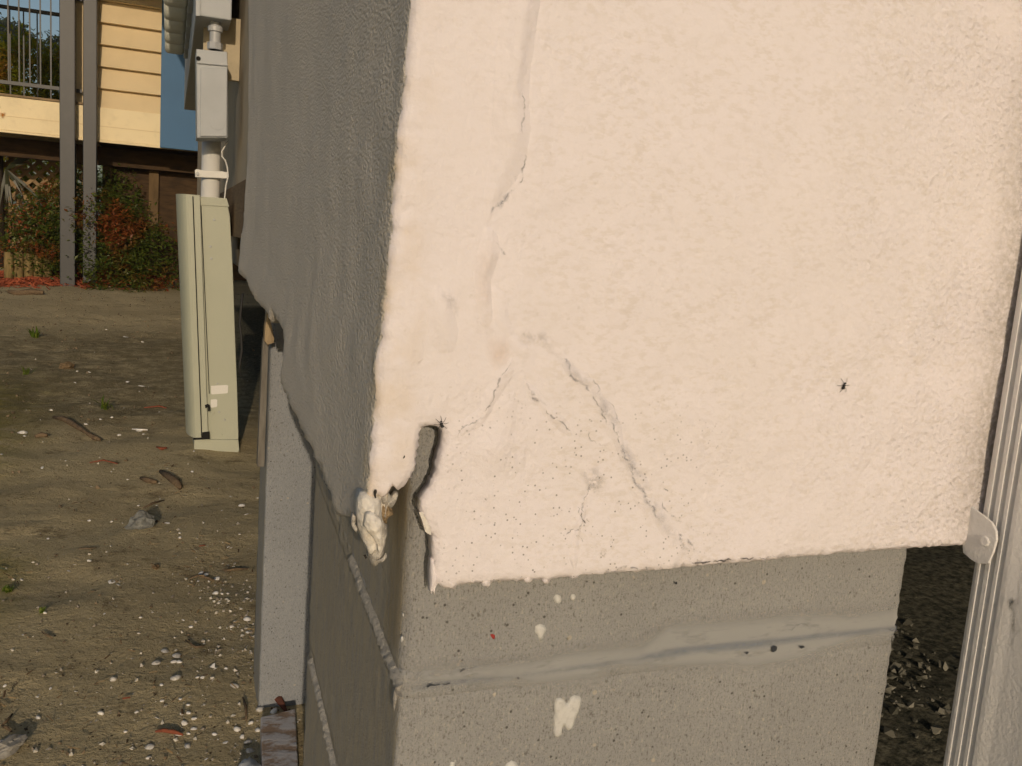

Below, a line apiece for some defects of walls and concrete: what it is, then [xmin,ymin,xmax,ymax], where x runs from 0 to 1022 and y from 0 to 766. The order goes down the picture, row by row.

spalling [350,487,398,566]
peeling [419,512,431,535]